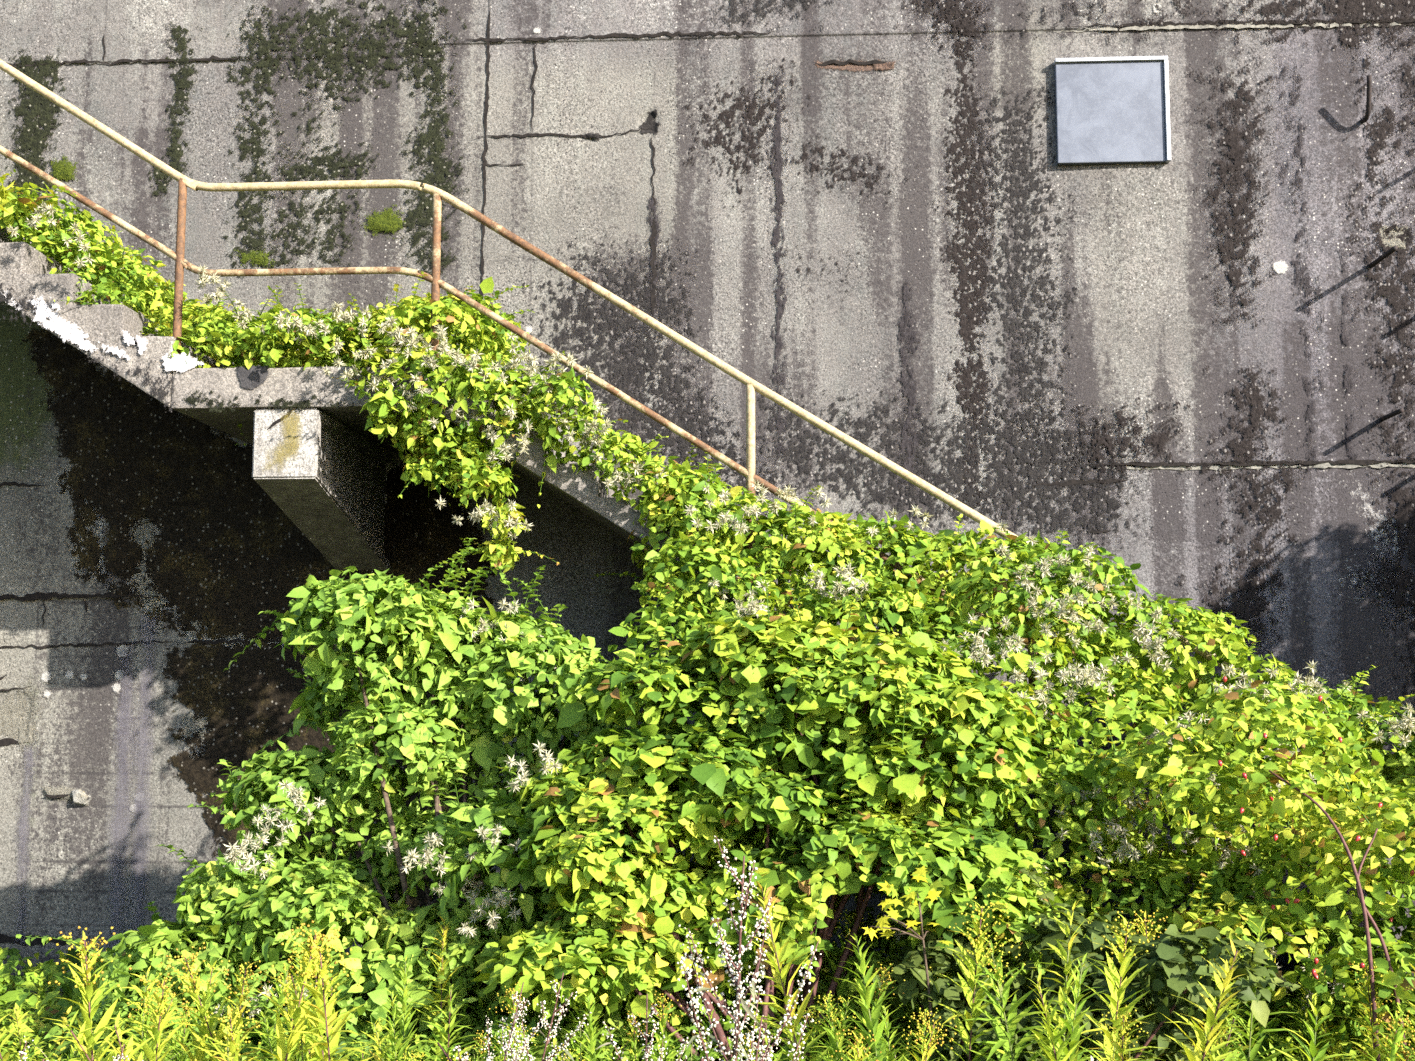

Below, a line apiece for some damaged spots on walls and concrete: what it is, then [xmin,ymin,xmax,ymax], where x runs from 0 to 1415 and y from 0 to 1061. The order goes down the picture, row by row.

crack [458,9,779,316]
water stain [85,349,178,412]
water stain [516,0,1415,714]
water stain [269,414,300,465]
crack [0,592,290,691]
crack [0,738,20,746]